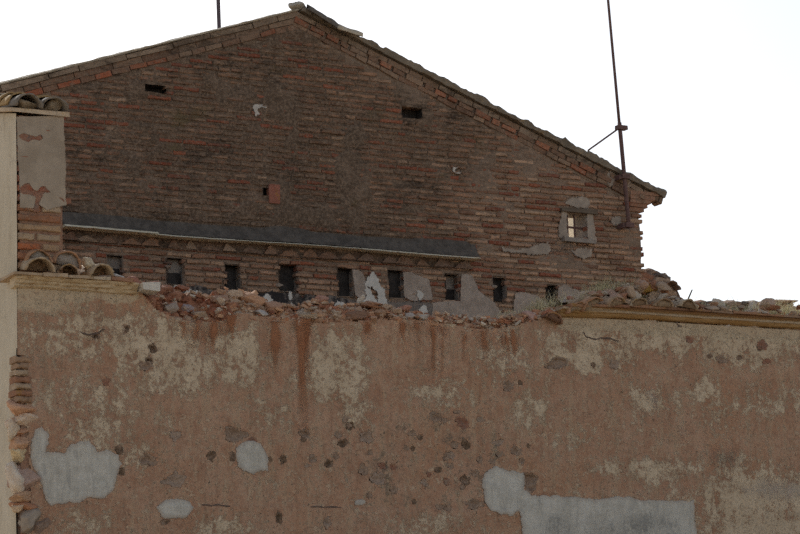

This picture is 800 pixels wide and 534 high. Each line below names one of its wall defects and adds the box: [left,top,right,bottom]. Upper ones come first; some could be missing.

flaking render [16,120,71,271]
peeling [363,271,388,304]
flaking render [4,356,41,534]